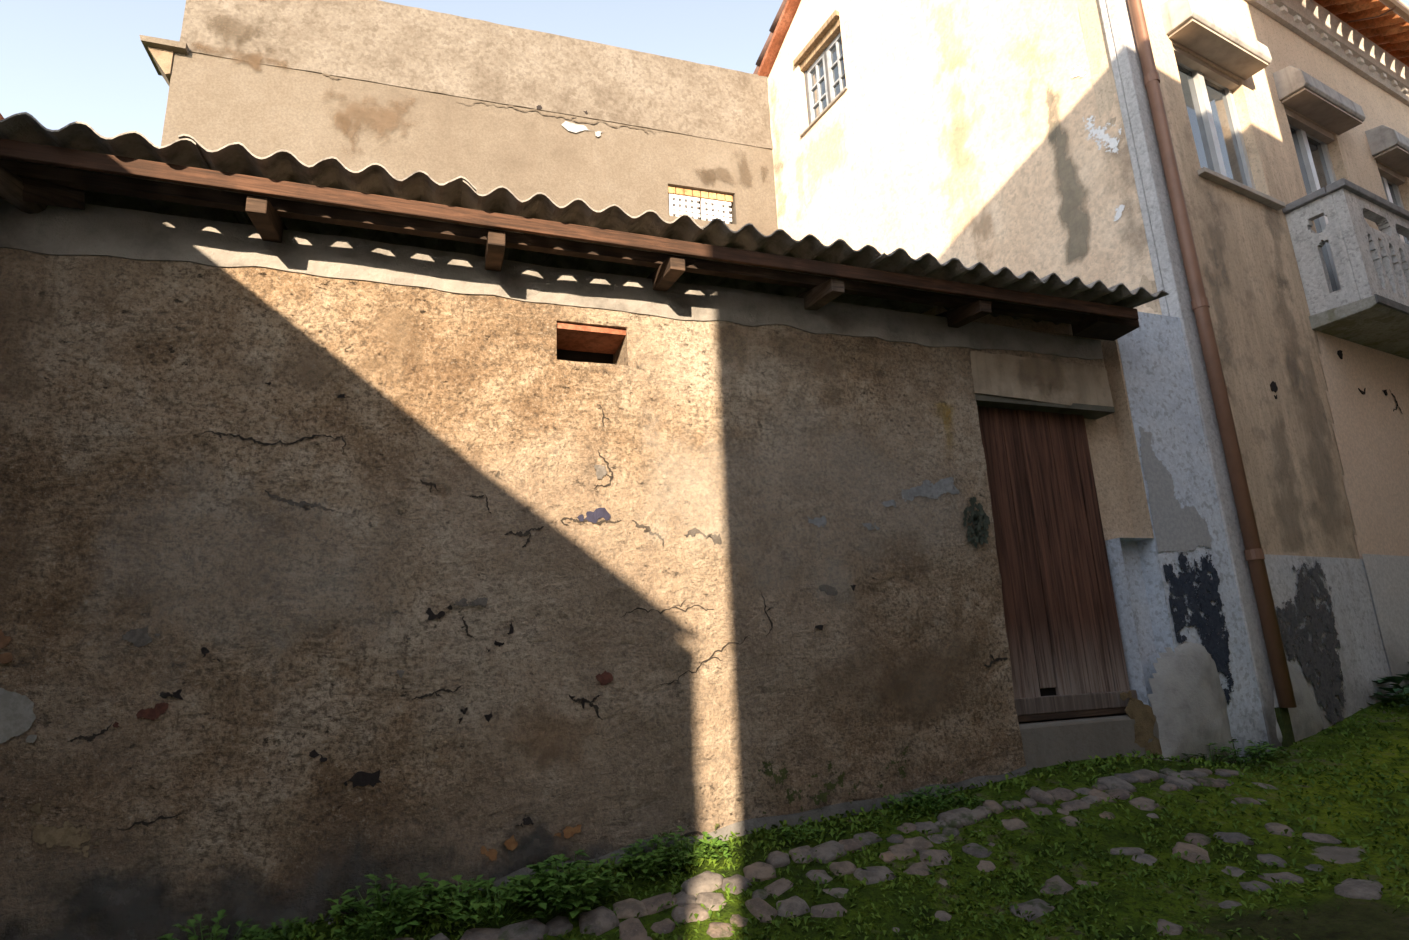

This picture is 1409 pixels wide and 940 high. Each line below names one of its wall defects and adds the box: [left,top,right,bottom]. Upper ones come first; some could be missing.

peeling [1083,115,1122,153]
damp [1047,92,1089,263]
crack [200,431,346,453]
crack [420,404,664,548]
spalling [577,508,611,523]
peeling [1139,426,1234,708]
crack [622,600,714,617]
crack [660,591,773,685]
peeling [1276,561,1346,725]
spalling [342,770,382,788]
crack [117,813,186,831]